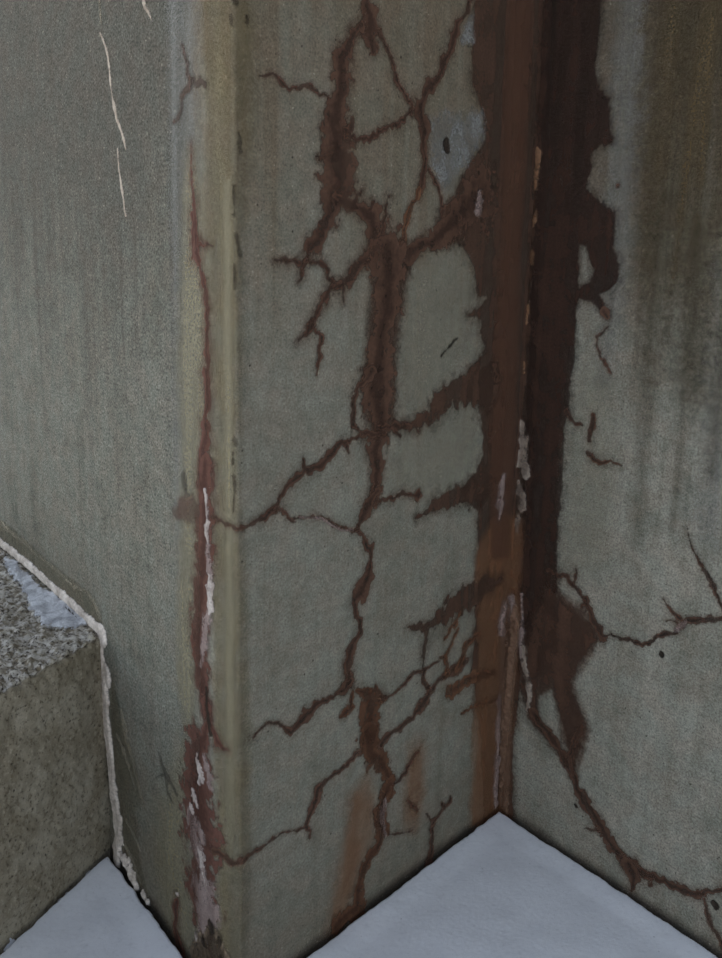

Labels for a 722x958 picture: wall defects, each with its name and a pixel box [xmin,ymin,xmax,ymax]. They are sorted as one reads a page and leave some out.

crack [100,33,126,217]
crack [158,0,499,935]
rust [392,0,620,826]
water stain [498,419,530,532]
crack [546,528,722,648]
water stain [493,593,532,814]
spalling [189,920,230,958]
crack [528,707,722,950]